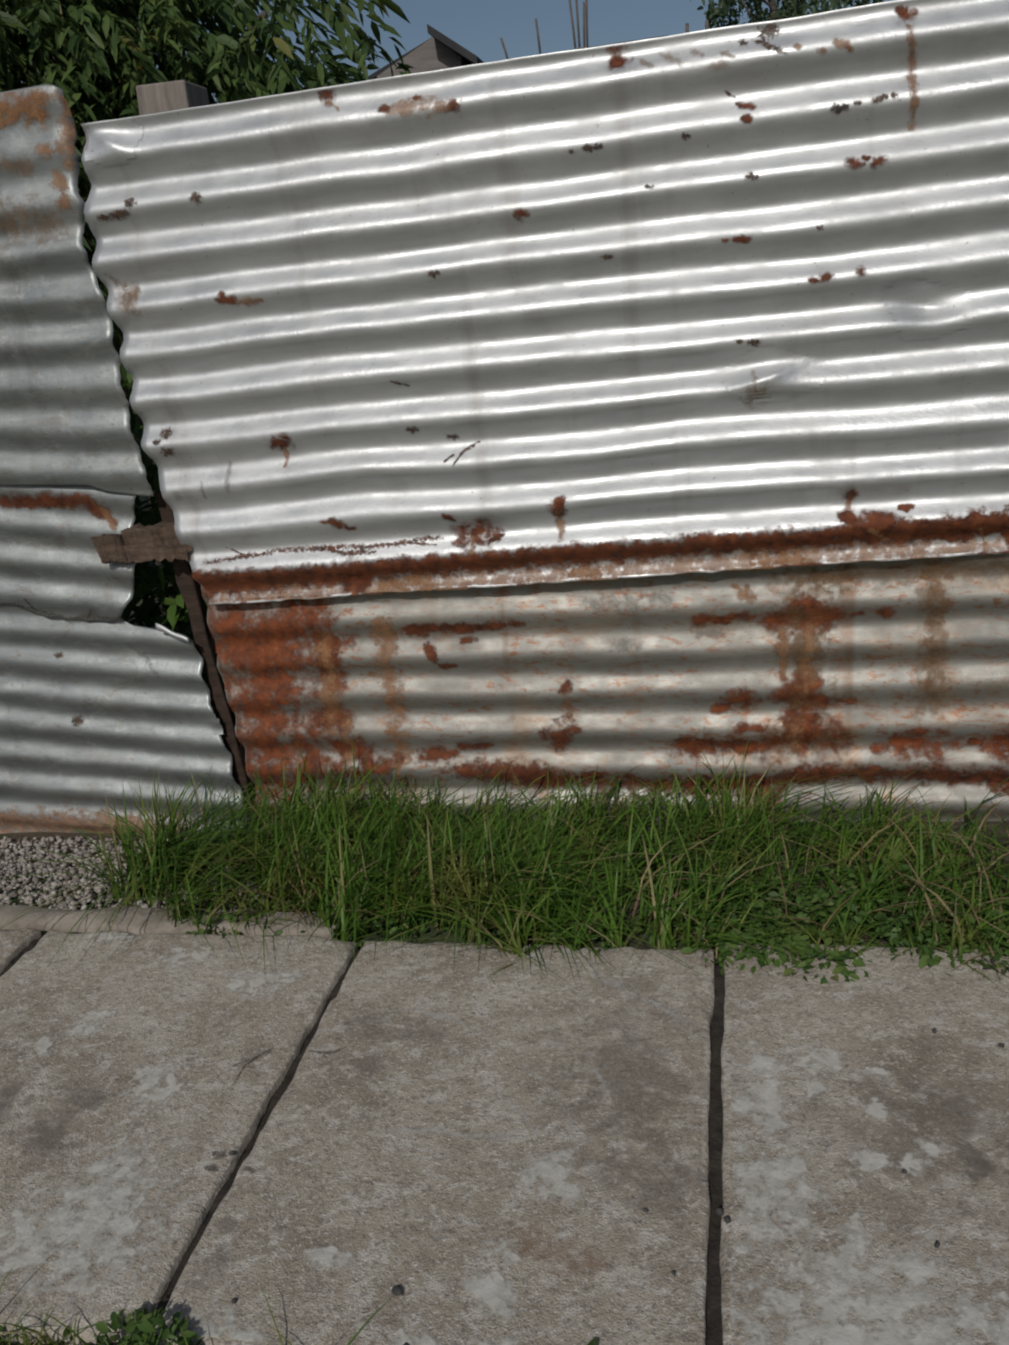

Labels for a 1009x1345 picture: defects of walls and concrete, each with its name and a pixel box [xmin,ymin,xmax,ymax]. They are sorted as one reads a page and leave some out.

rust [895,6,919,130]
rust [378,95,459,115]
rust [0,91,75,208]
rust [846,155,886,169]
rust [215,291,263,306]
rust [270,435,289,467]
rust [0,493,117,530]
rust [191,490,1009,823]